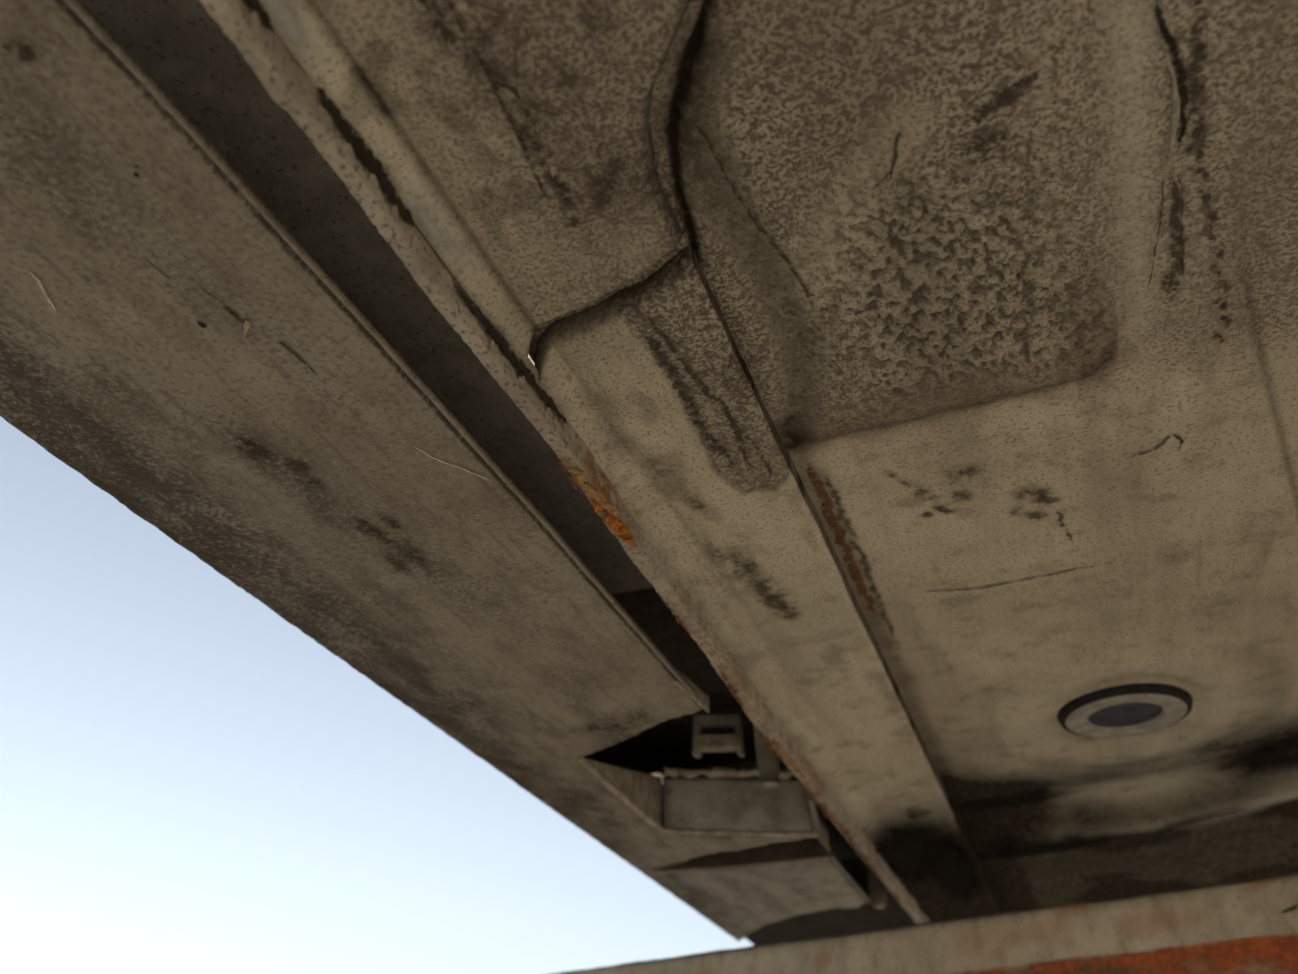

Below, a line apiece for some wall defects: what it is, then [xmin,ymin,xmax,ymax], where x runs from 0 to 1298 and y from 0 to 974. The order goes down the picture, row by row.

crack [1148,0,1232,343]
water stain [237,437,322,486]
rust [558,462,635,548]
water stain [889,474,970,518]
water stain [1011,490,1072,539]
water stain [355,514,425,572]
rust [964,936,1298,974]